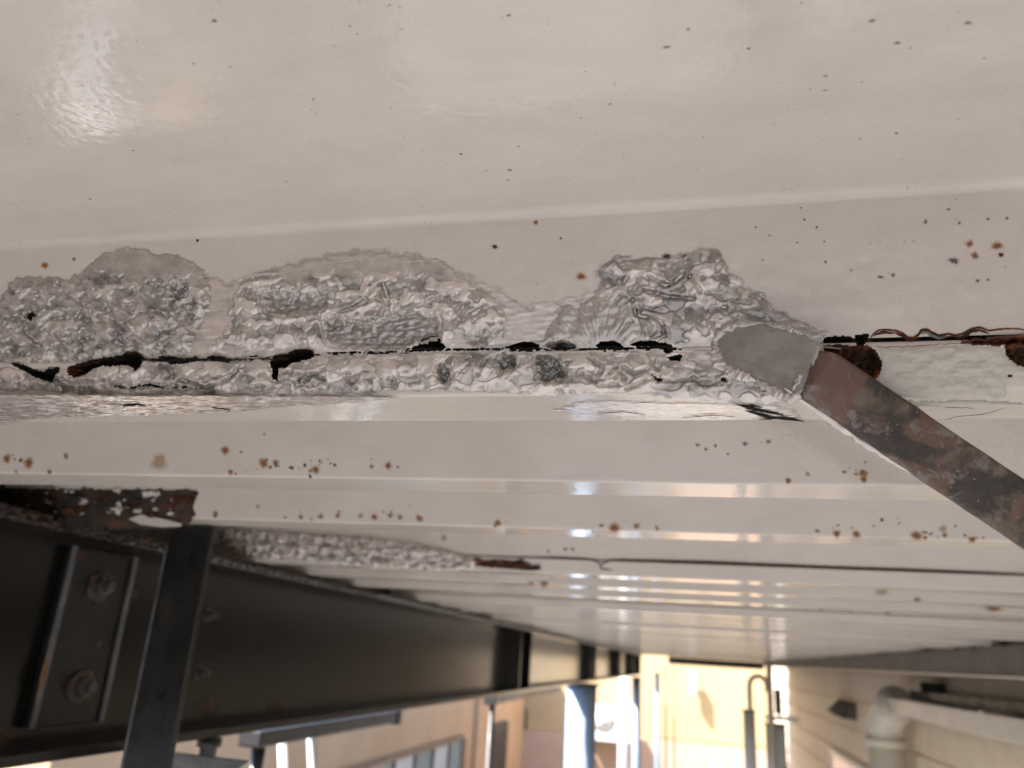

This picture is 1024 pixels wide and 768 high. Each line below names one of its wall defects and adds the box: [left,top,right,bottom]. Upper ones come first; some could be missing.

crack [11,351,273,411]
crack [327,336,682,382]
rust [260,459,336,478]
rust [5,470,199,531]
rust [912,525,984,542]